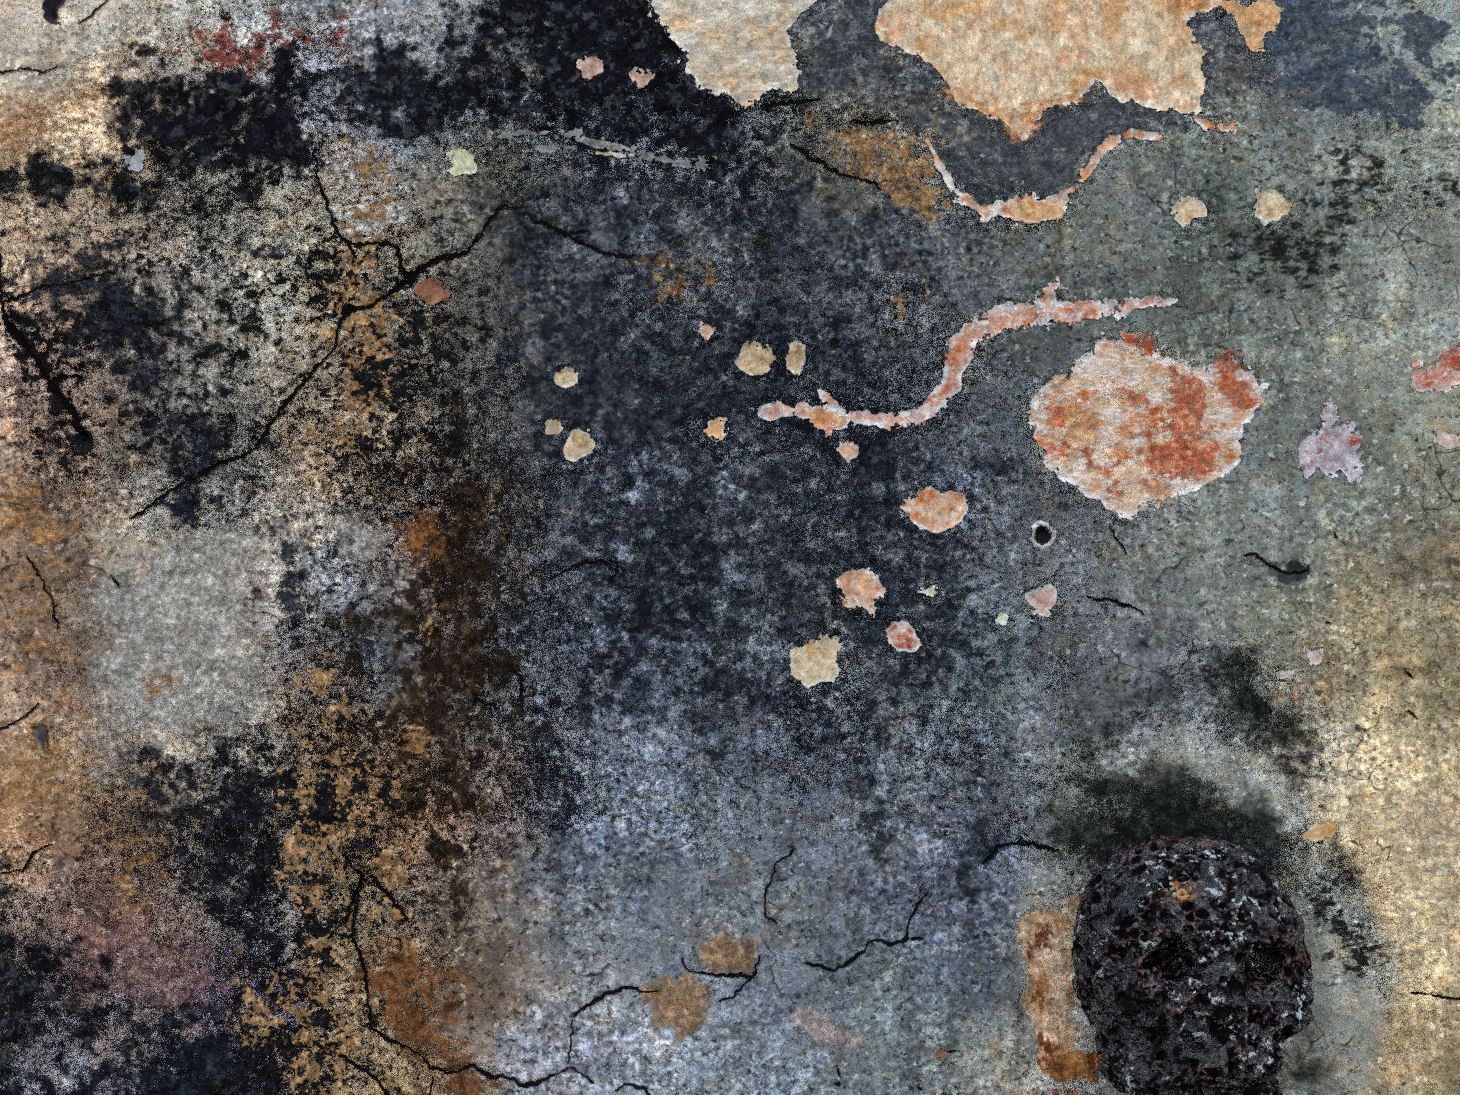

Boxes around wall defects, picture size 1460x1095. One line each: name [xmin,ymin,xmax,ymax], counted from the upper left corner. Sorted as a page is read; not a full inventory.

peeling [647,0,817,109]
peeling [875,0,1284,142]
peeling [925,128,1162,224]
water stain [1189,120,1460,297]
crack [0,254,114,445]
crack [129,148,635,520]
peeling [757,276,1269,521]
water stain [0,0,1032,1095]
spalling [900,486,968,533]
rust [343,938,502,1095]
crack [326,849,794,1095]
crack [805,890,928,972]